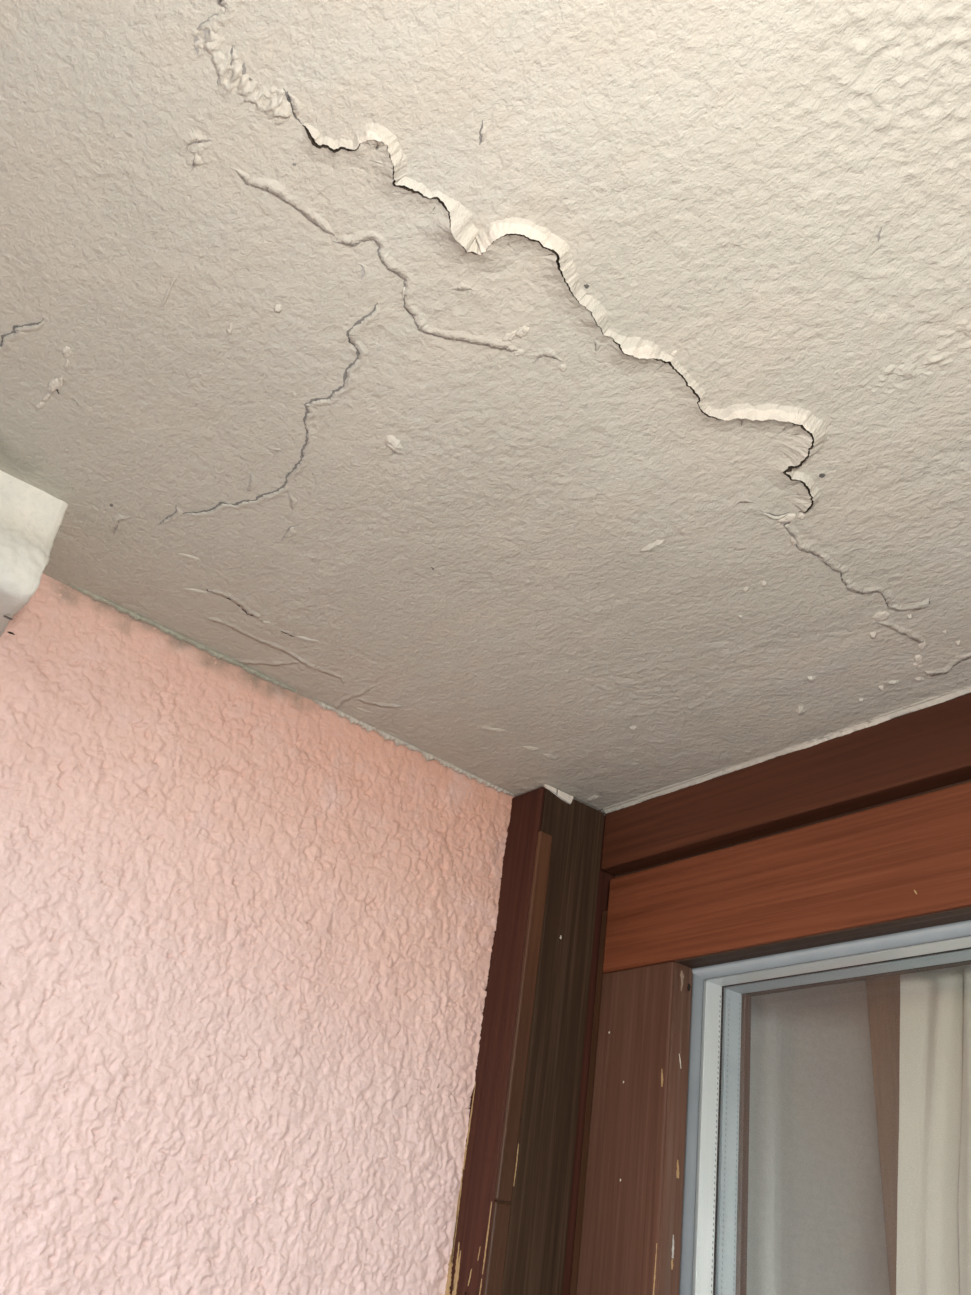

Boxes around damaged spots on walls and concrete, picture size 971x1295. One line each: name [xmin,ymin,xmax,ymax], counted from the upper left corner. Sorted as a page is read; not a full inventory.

crack [0,318,44,355]
crack [108,0,971,713]